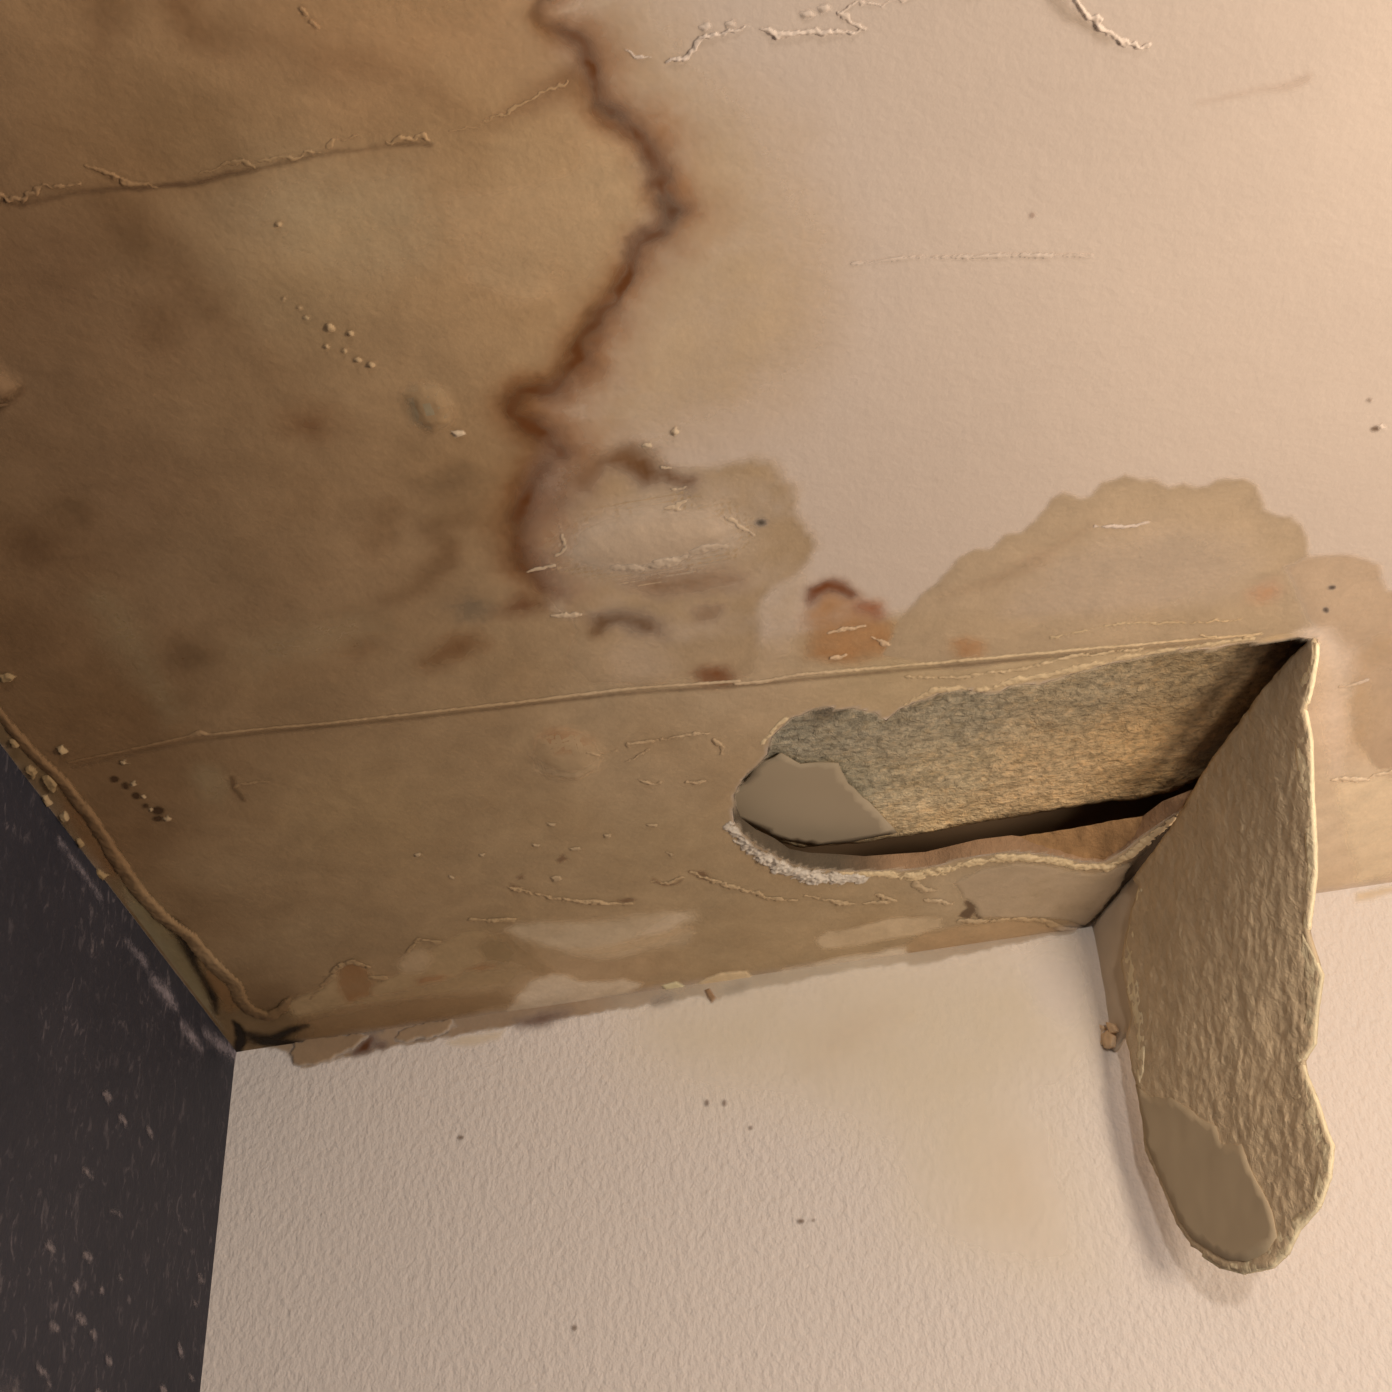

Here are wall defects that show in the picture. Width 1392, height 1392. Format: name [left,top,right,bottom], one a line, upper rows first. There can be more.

crack [626,0,907,63]
crack [1053,0,1151,50]
crack [0,80,569,205]
leakage [0,0,1392,1042]
crack [67,633,1262,764]
crack [175,920,307,1052]